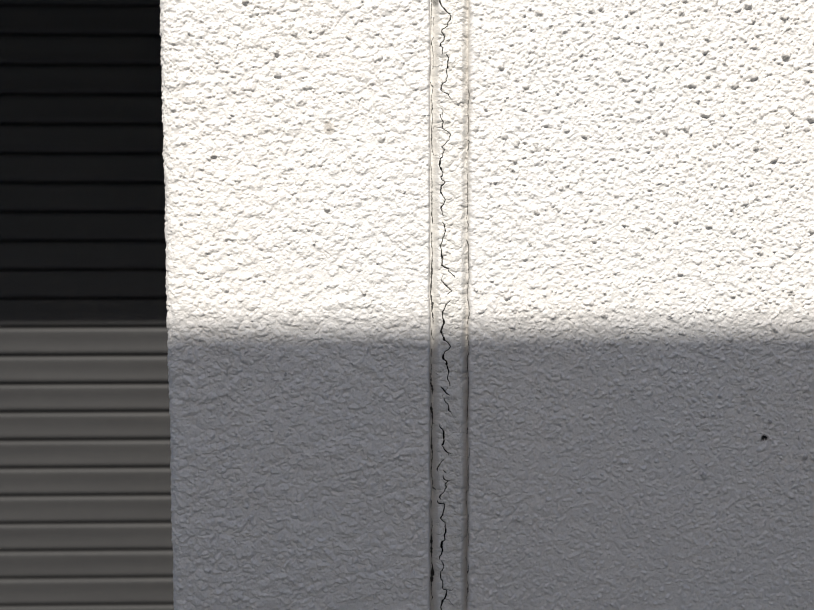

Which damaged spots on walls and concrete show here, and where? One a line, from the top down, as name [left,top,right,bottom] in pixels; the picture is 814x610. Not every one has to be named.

crack [424,0,470,610]